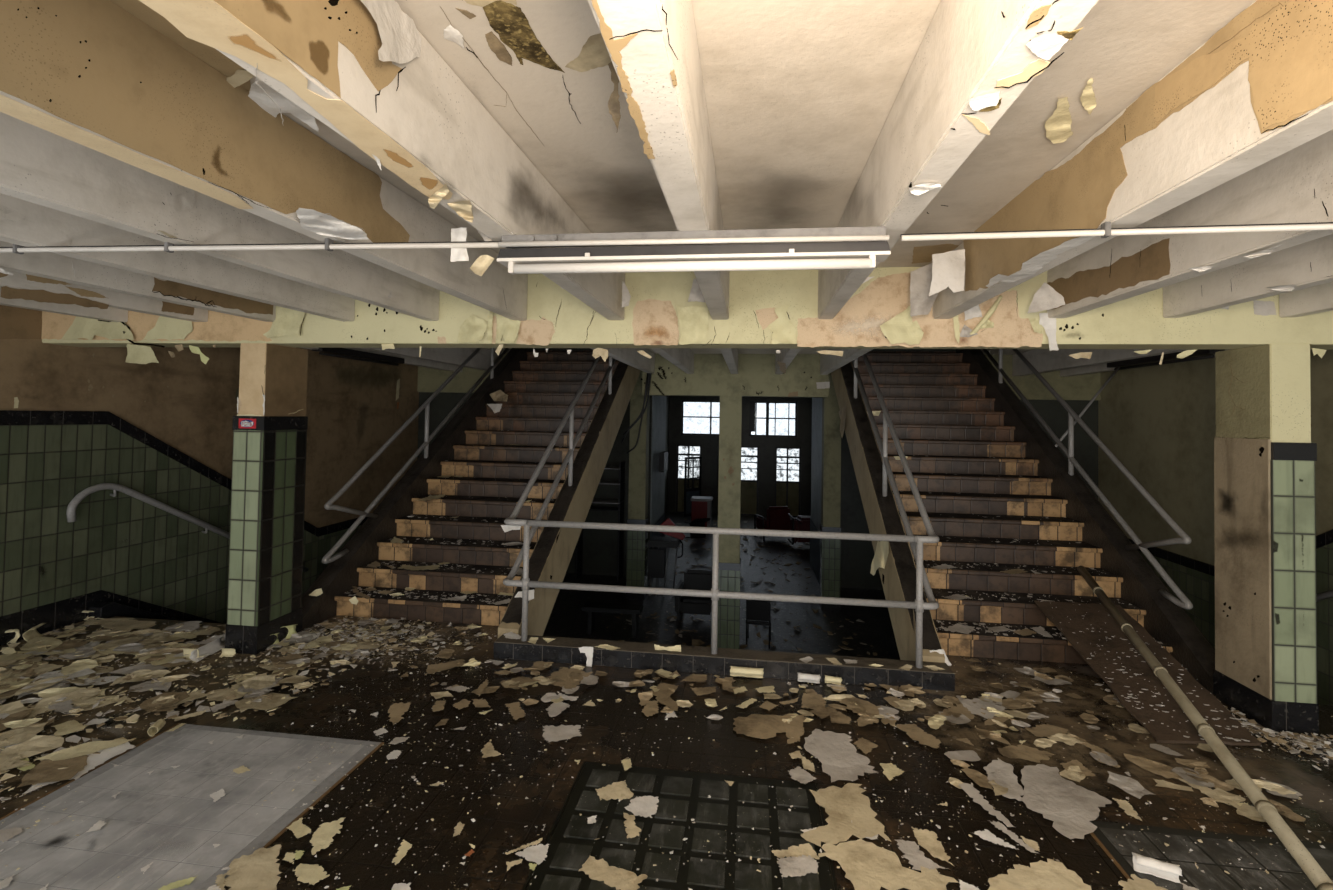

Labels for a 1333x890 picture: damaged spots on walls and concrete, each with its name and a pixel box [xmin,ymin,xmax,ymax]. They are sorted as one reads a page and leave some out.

damp [263,0,288,19]
peeling [443,0,655,159]
peeling [0,0,495,276]
peeling [0,268,305,364]
peeling [438,311,555,357]
peeling [592,348,608,362]
peeling [622,282,708,358]
peeling [1133,350,1196,365]